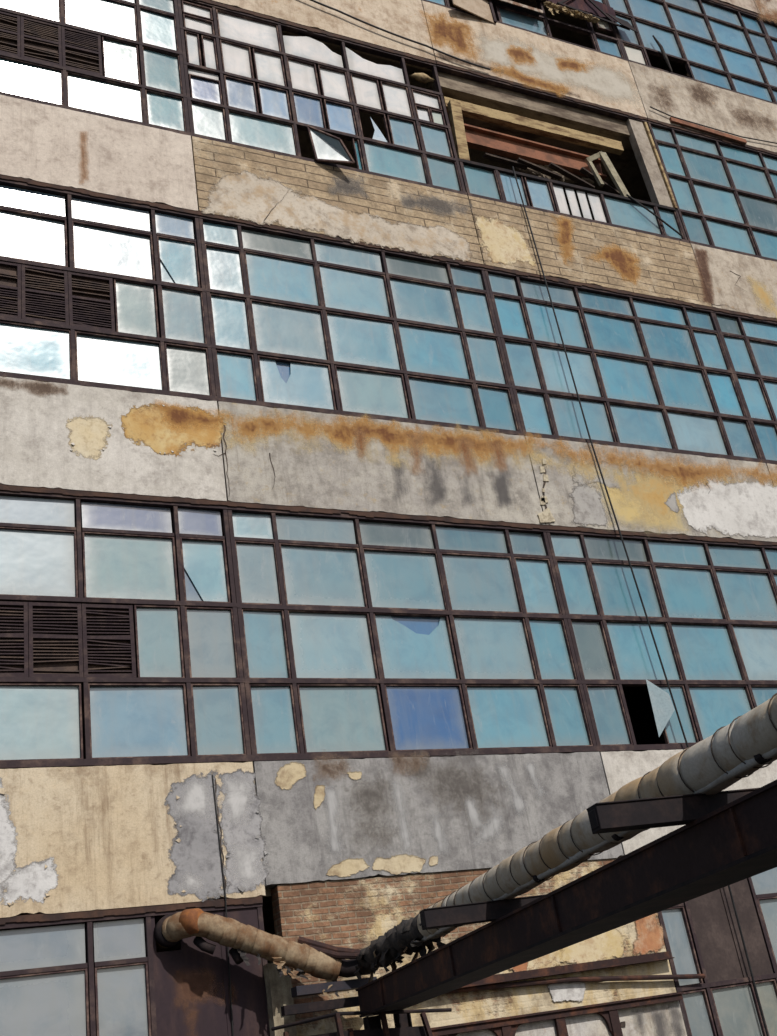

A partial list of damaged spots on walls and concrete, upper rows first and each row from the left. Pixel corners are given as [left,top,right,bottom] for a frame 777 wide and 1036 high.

corrosion [426,13,476,57]
corrosion [494,46,568,95]
corrosion [557,59,586,71]
peeling [201,170,536,266]
corrosion [594,246,640,284]
peeling [66,403,227,460]
crack [214,425,230,495]
corrosion [223,414,777,520]
peeling [569,458,777,539]
peeling [164,769,269,902]
peeling [326,853,438,877]
peeling [511,913,663,972]